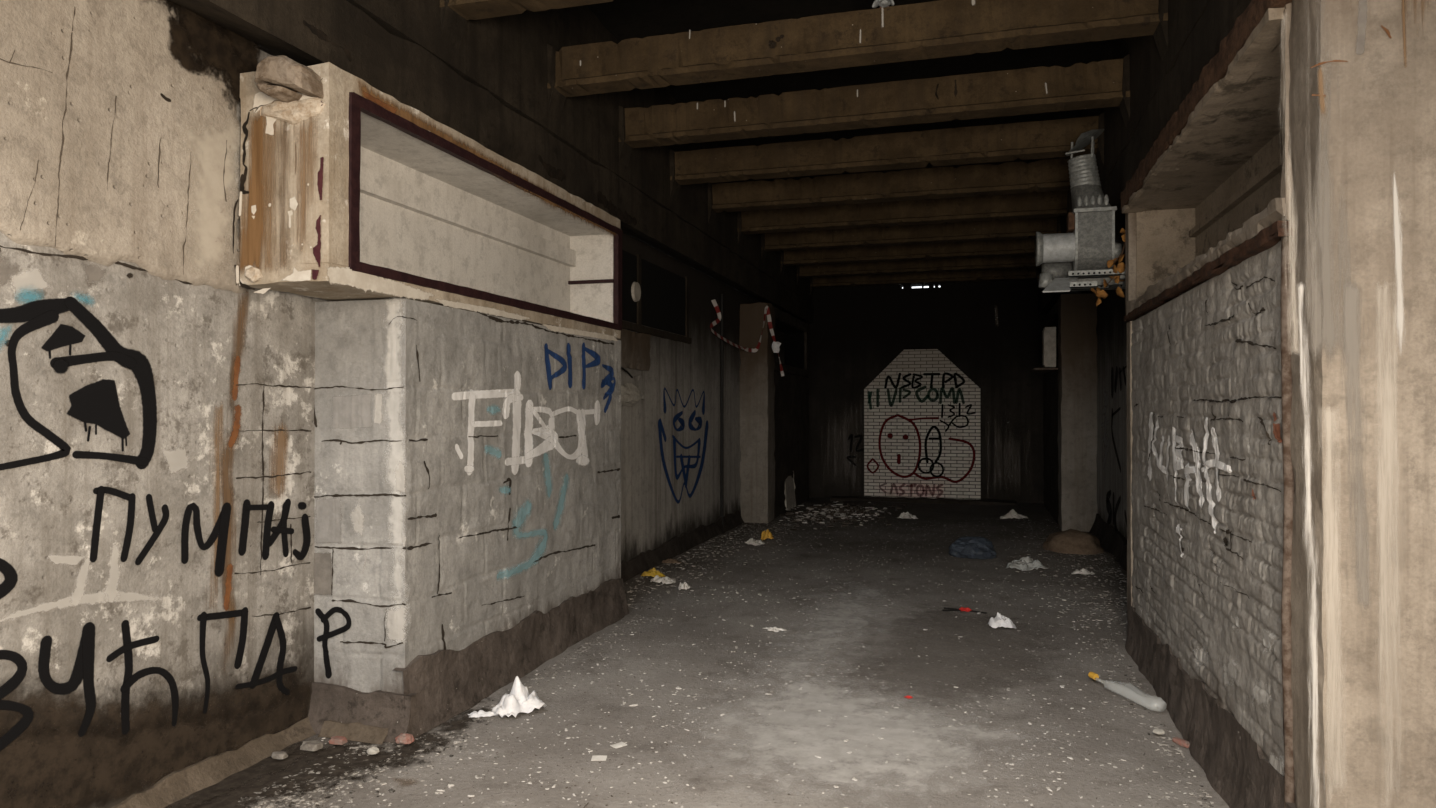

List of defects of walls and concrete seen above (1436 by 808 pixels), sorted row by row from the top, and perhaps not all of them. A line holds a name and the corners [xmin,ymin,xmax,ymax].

crack [0,6,258,290]
corrosion [240,115,316,271]
corrosion [213,292,248,652]
corrosion [272,423,288,494]